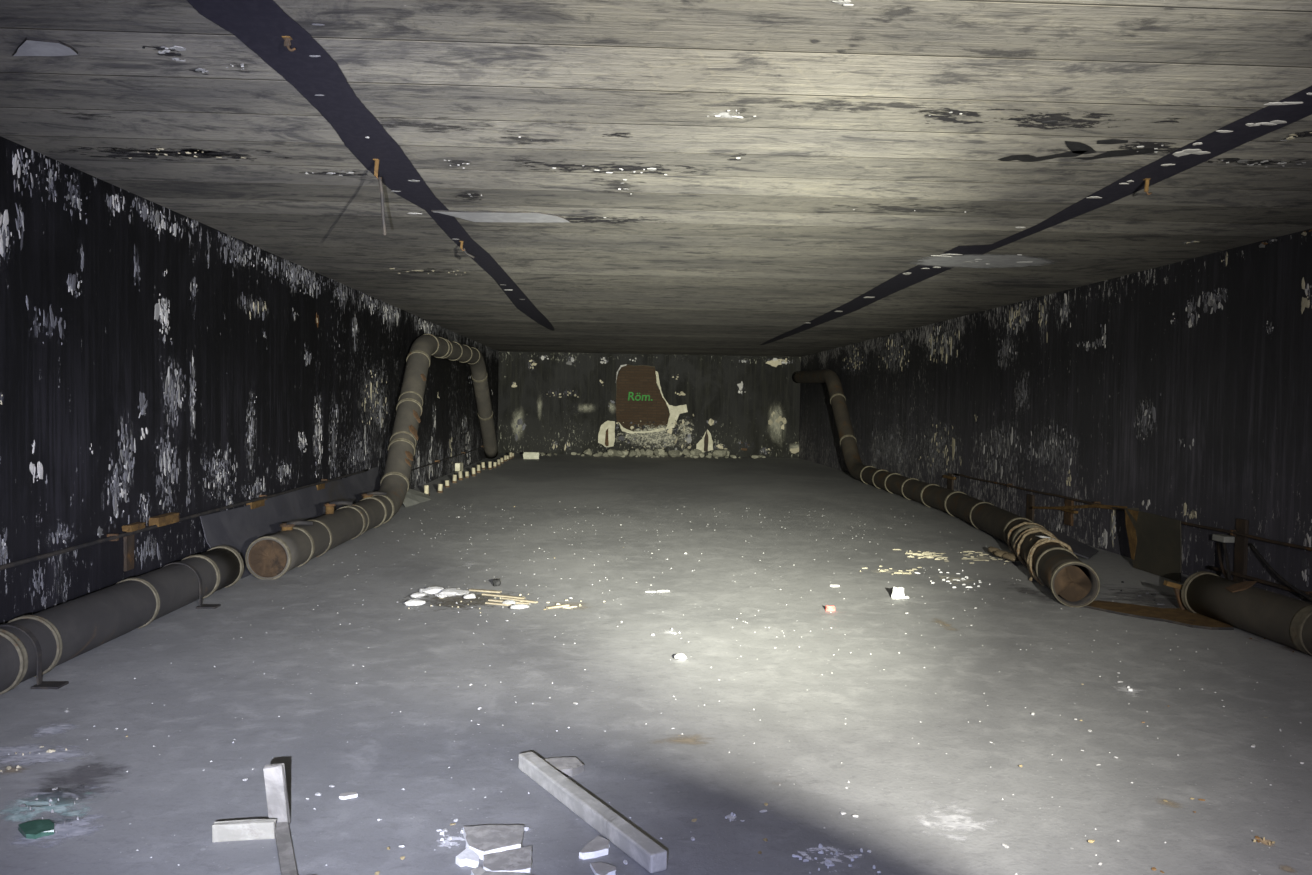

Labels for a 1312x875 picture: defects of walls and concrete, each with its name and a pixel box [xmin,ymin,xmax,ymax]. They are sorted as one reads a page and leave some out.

peeling [0,148,87,262]
peeling [218,233,346,300]
peeling [154,293,186,426]
peeling [95,392,151,538]